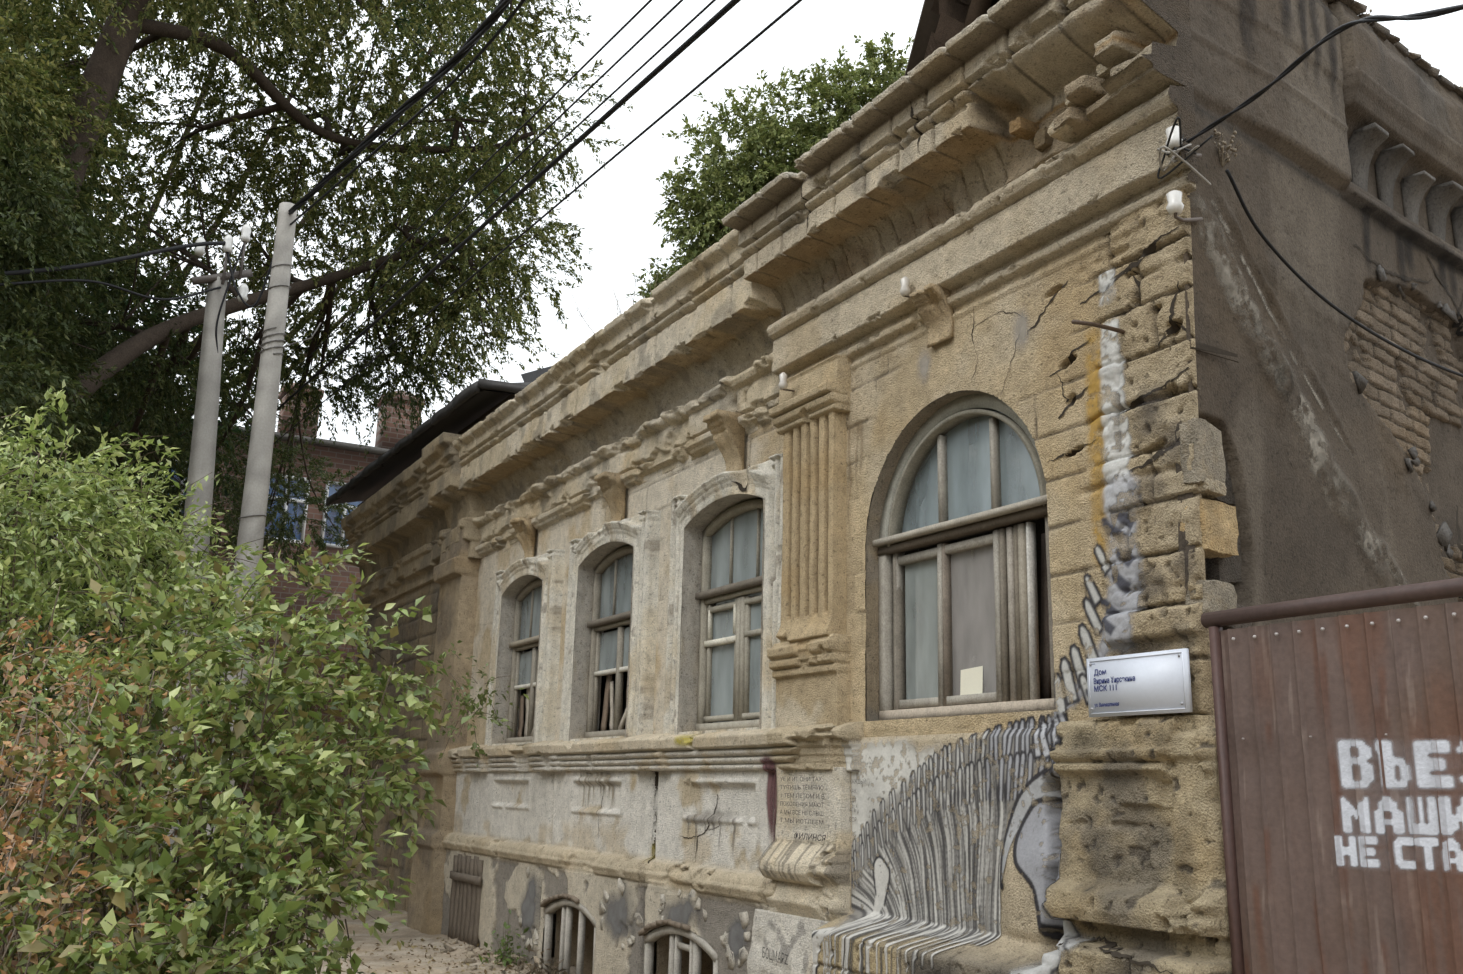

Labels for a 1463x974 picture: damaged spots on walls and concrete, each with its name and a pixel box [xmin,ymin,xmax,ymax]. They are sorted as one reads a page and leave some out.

crack [971,226,1239,462]
crack [1117,437,1180,476]
spalling [1344,265,1463,579]